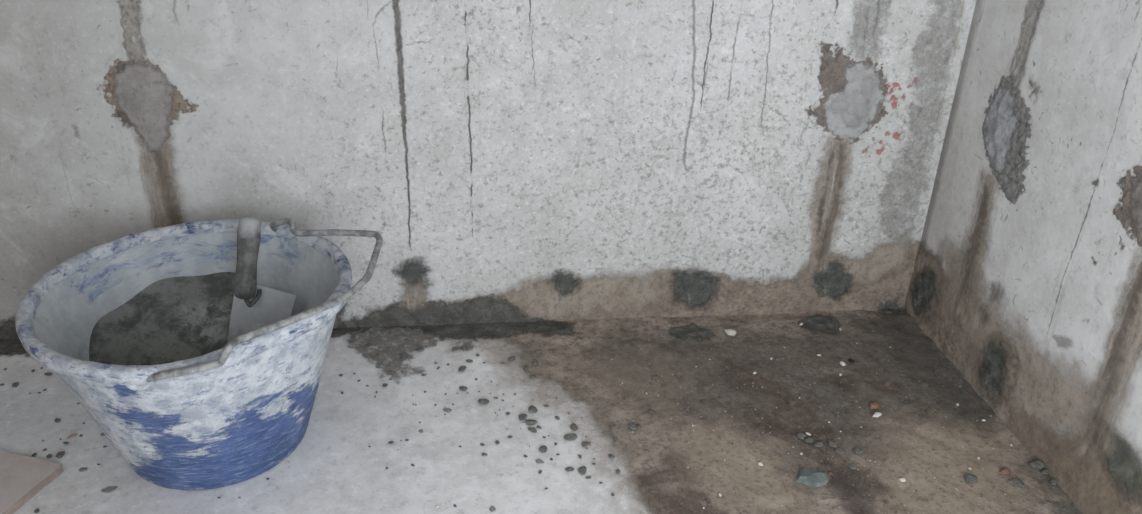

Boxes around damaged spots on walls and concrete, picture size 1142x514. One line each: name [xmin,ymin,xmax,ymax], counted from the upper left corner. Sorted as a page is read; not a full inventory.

spalling [97,59,199,152]
leakage [139,136,181,228]
crack [392,0,411,246]
crack [464,12,473,234]
crack [701,1,714,107]
spalling [806,43,888,144]
spalling [982,75,1038,204]
spalling [1113,166,1142,250]
leakage [0,318,29,356]
leakage [331,139,1142,514]